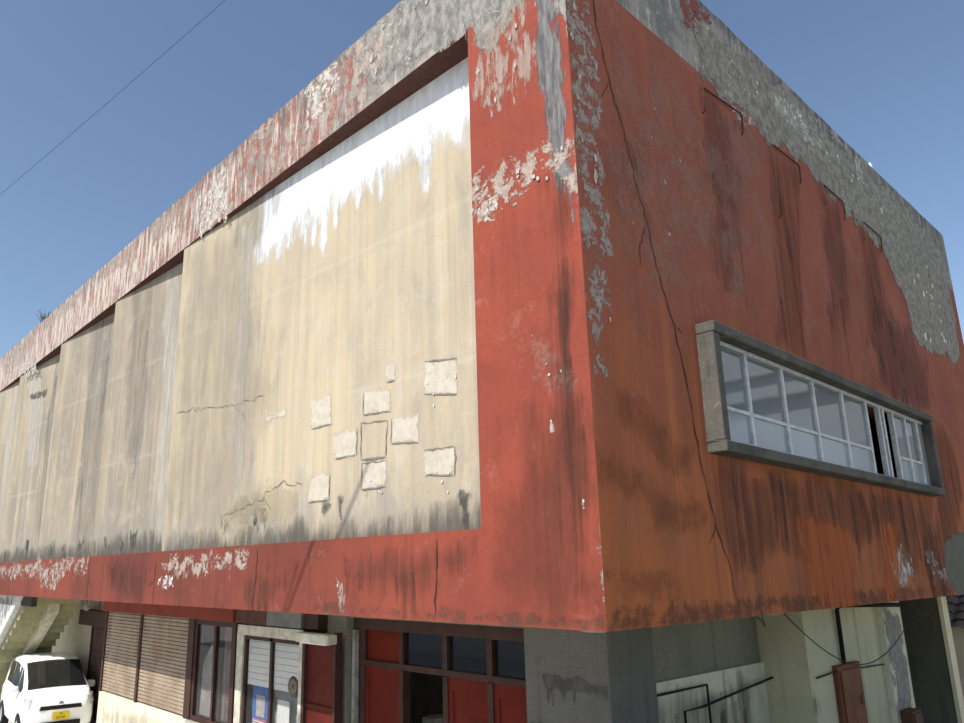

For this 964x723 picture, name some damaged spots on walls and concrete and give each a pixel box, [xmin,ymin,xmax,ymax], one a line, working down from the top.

flaking render [301,0,536,130]
peeling [150,164,231,246]
leakage [355,175,383,208]
peeling [469,0,613,386]
flaking render [692,7,960,367]
leakage [304,209,338,254]
crack [593,0,738,601]
peeling [0,555,89,590]
leakage [0,532,160,563]
peeling [157,549,250,589]
leakage [174,511,329,550]
leakage [414,490,481,533]